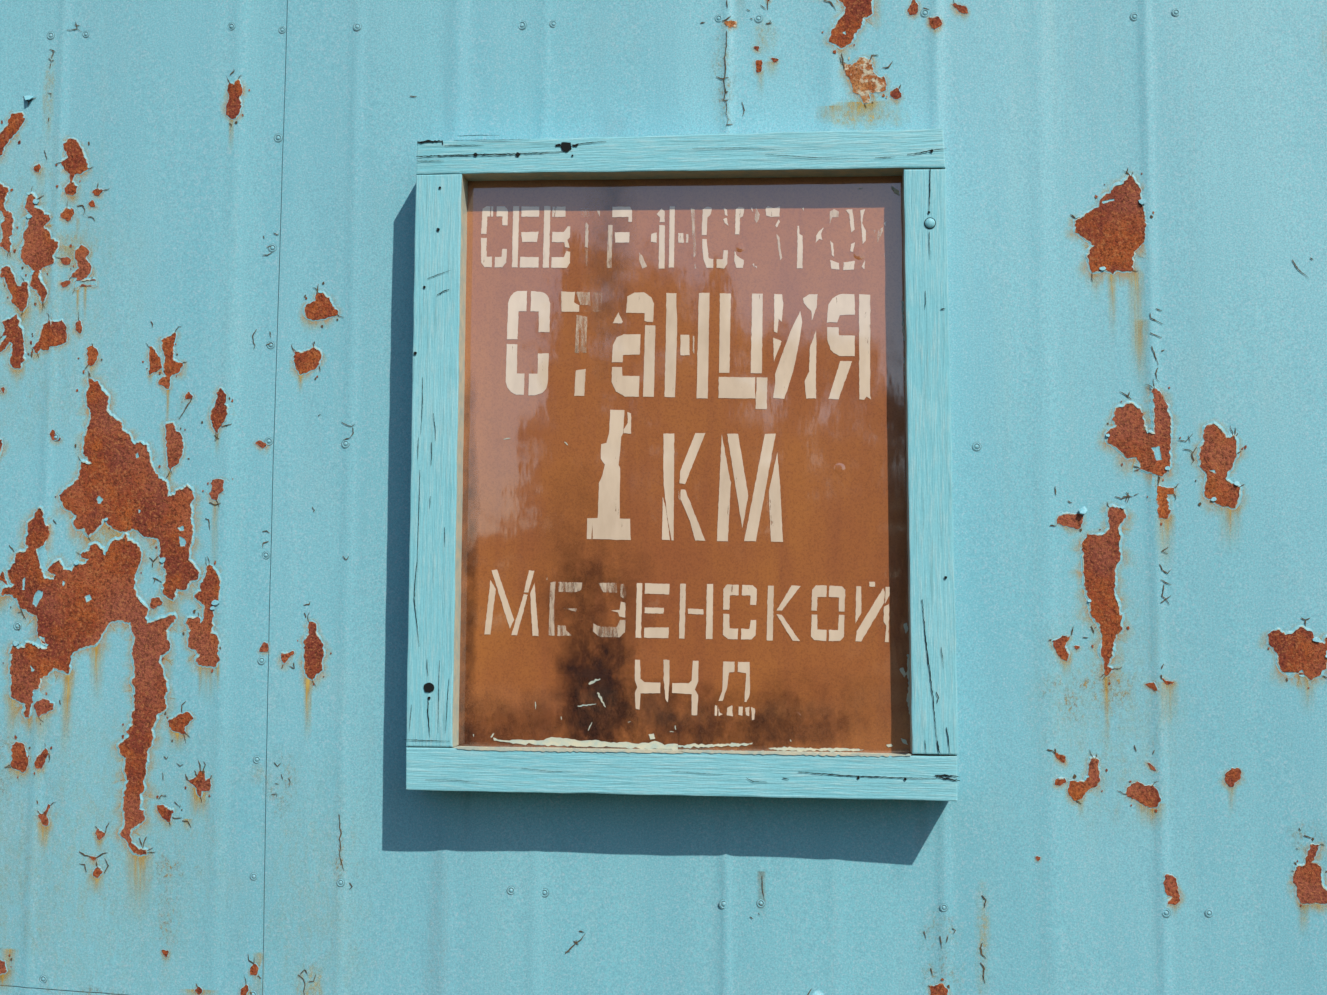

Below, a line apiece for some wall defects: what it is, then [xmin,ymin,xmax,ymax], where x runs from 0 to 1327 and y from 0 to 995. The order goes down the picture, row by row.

rust [225,71,250,126]
rust [822,0,893,121]
rust [0,136,97,372]
rust [1070,169,1154,294]
rust [142,322,186,399]
rust [291,282,342,382]
rust [1191,420,1247,519]
rust [1050,379,1181,699]
rust [0,344,233,868]
rust [297,602,332,704]
rust [1266,617,1327,689]
rust [1290,828,1327,907]